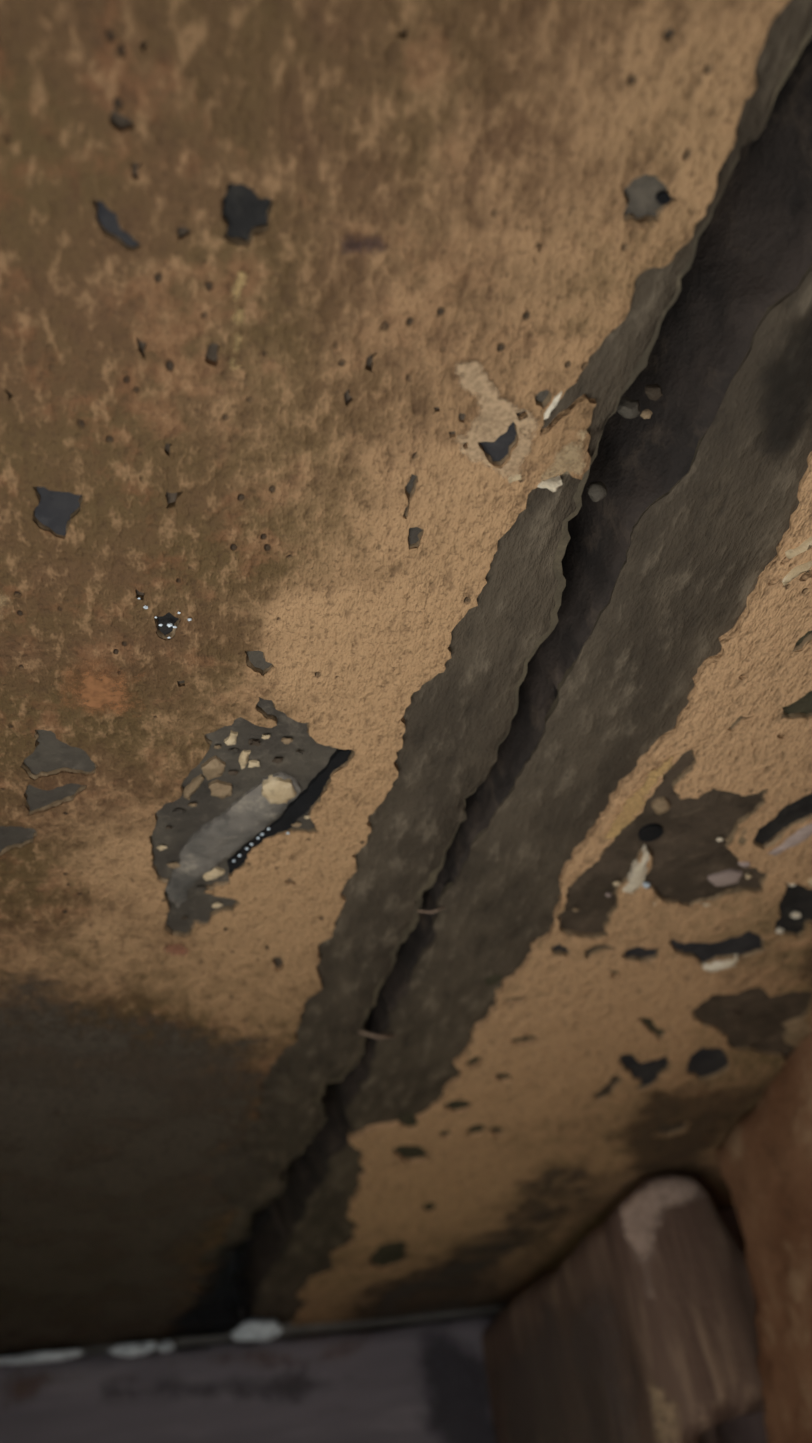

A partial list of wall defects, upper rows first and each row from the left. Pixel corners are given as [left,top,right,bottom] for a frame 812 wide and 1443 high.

spalling [150,0,812,1324]
crack [218,37,812,1324]